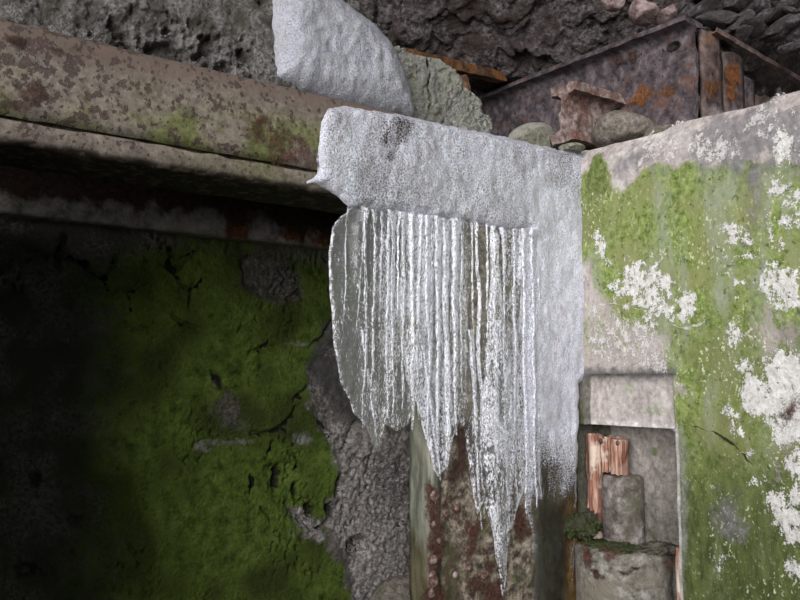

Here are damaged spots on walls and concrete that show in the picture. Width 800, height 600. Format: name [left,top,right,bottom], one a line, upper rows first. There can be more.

rust [6,36,25,49]
rust [0,76,49,113]
rust [690,62,741,102]
rust [245,115,319,168]
leakage [617,93,800,193]
crack [165,246,202,293]
efflorescence [588,300,668,380]
crack [251,387,306,452]
crack [681,421,752,464]
spalling [289,419,410,600]